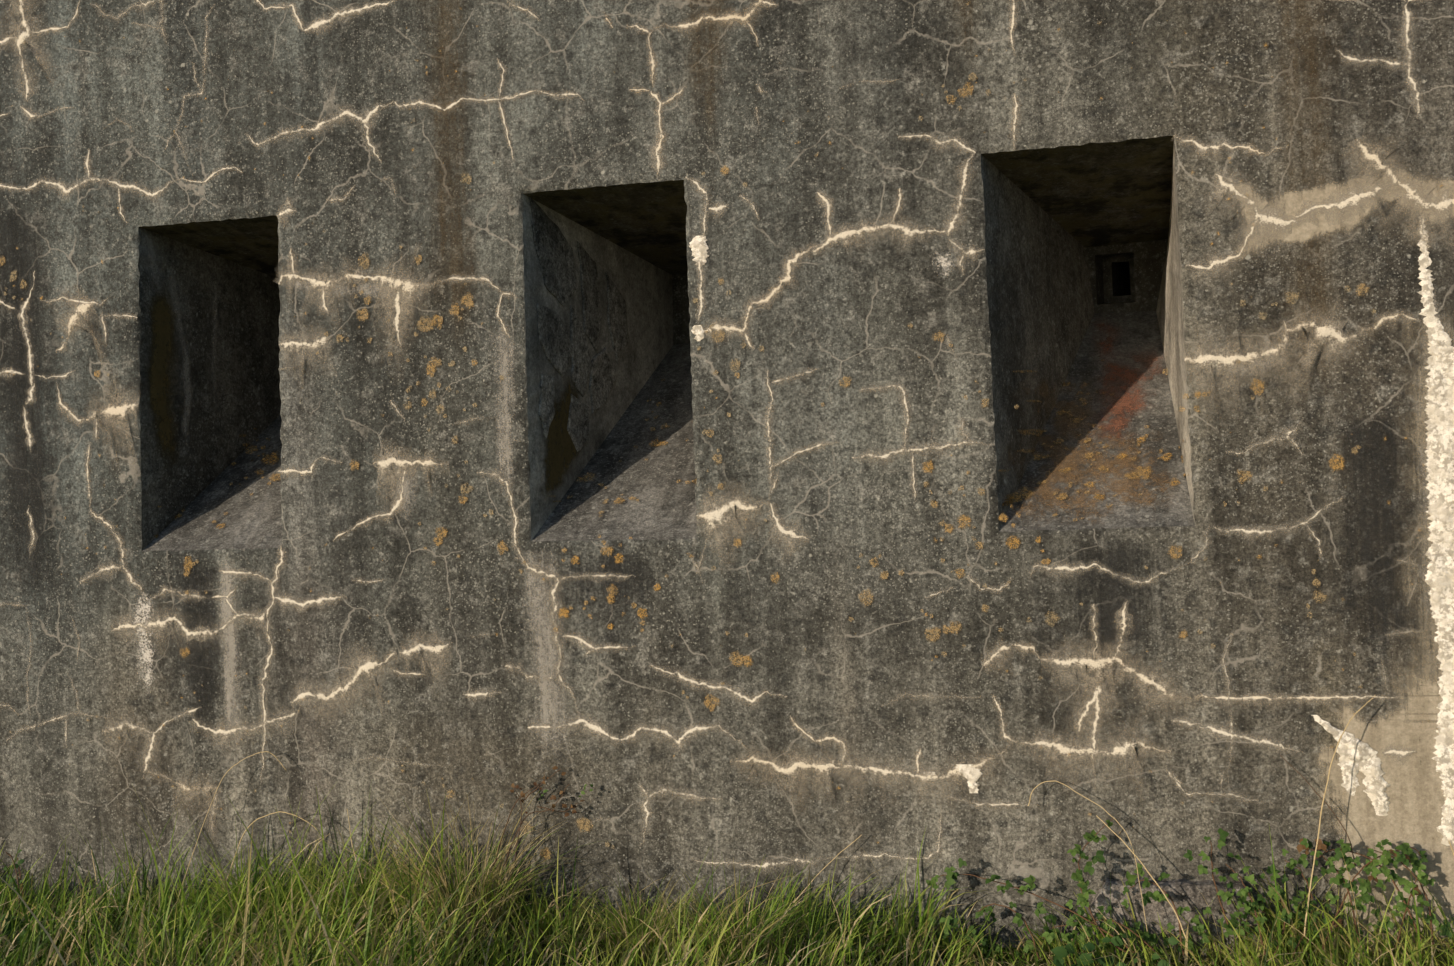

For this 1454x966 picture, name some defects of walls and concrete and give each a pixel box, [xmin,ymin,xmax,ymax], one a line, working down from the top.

crack [0,0,582,369]
crack [1009,0,1017,49]
crack [1011,93,1020,148]
crack [1173,135,1454,274]
crack [1336,0,1423,118]
crack [605,0,989,570]
crack [0,271,1419,871]
water stain [1233,169,1454,964]
water stain [953,764,982,793]